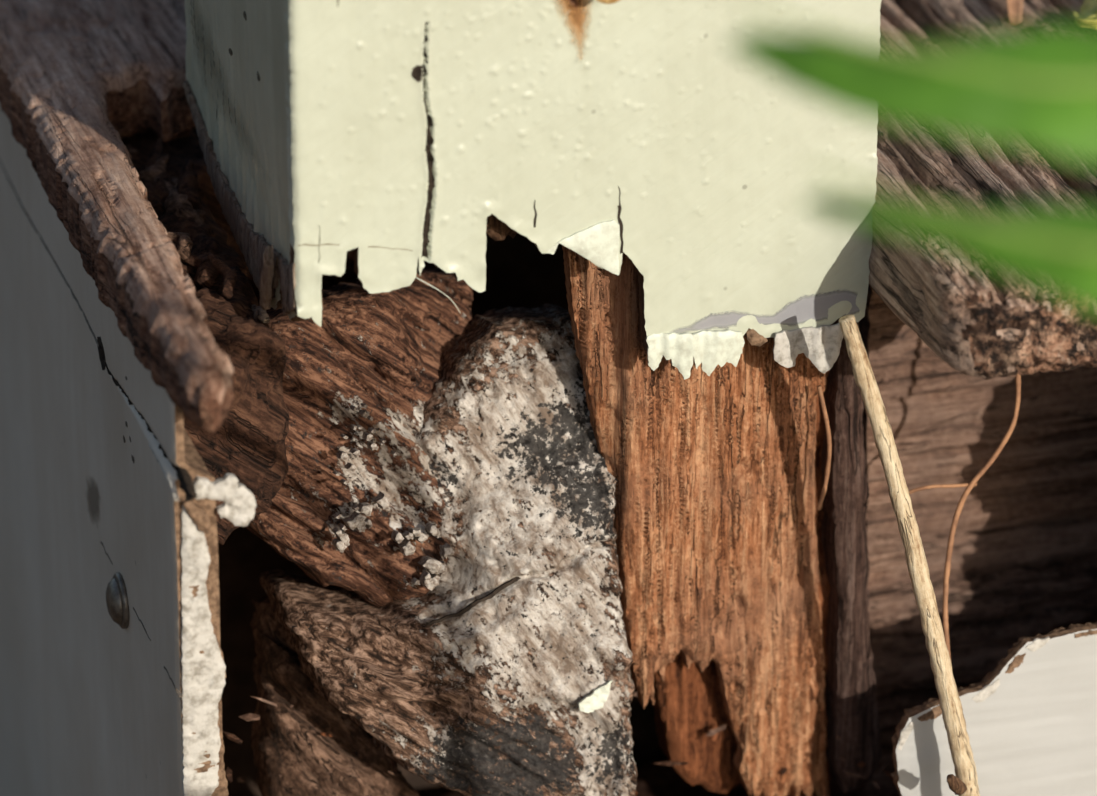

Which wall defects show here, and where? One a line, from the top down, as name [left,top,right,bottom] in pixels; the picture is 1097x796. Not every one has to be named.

rust [558,0,589,46]
crack [411,22,435,258]
peeling [547,219,620,275]
crack [0,161,198,502]
peeling [646,323,843,380]
spalling [972,637,1050,703]
spalling [897,705,942,750]